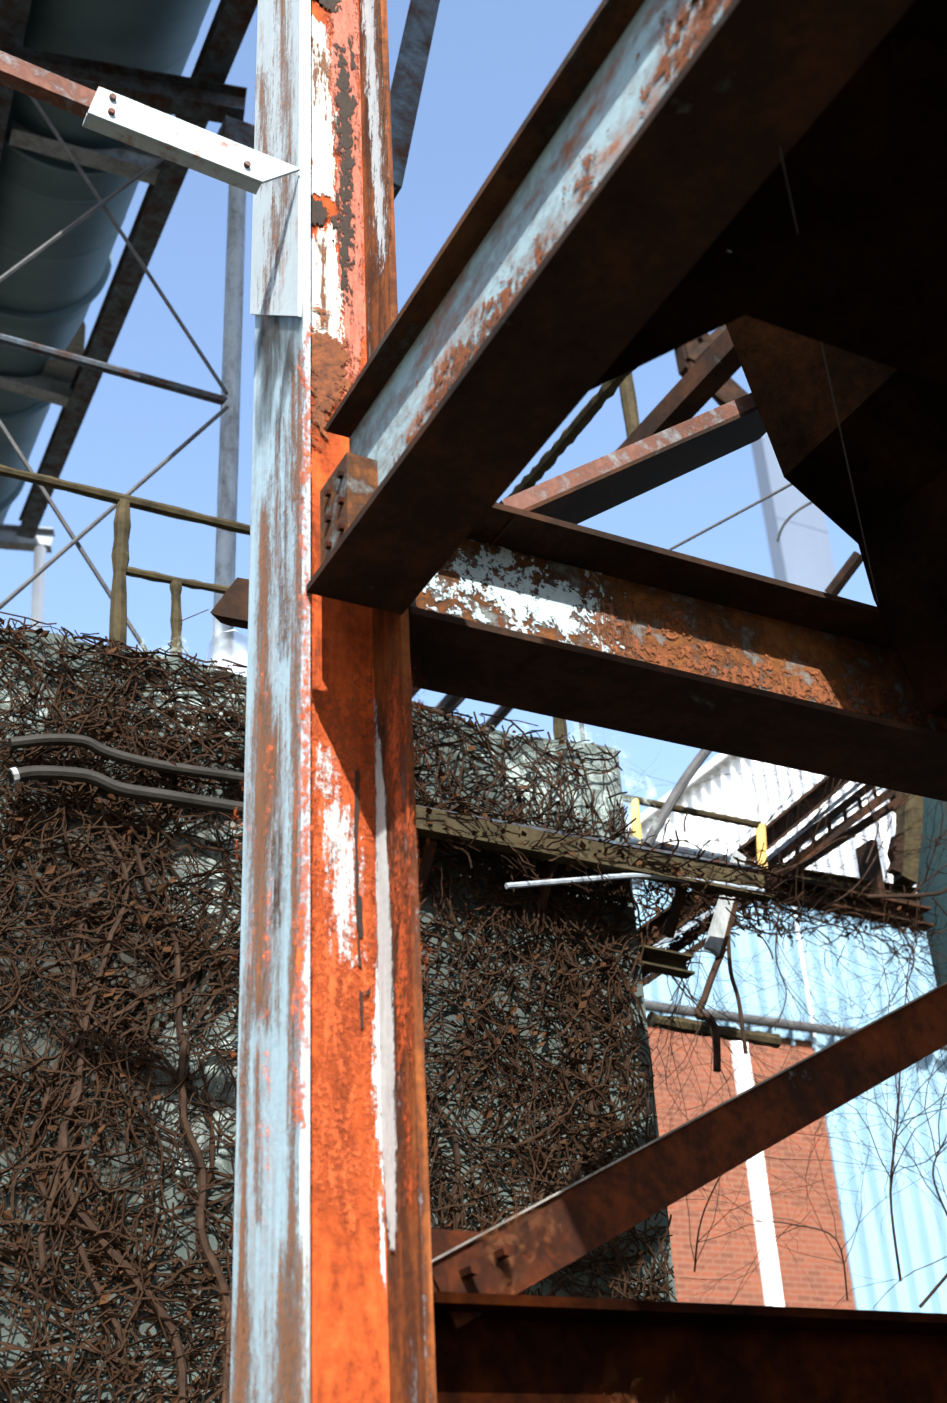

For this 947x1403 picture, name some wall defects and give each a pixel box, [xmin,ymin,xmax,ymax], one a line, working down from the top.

corrosion [624,0,731,123]
corrosion [392,129,618,464]
corrosion [223,0,433,1403]
peeling [423,539,626,654]
peeling [316,698,397,1285]